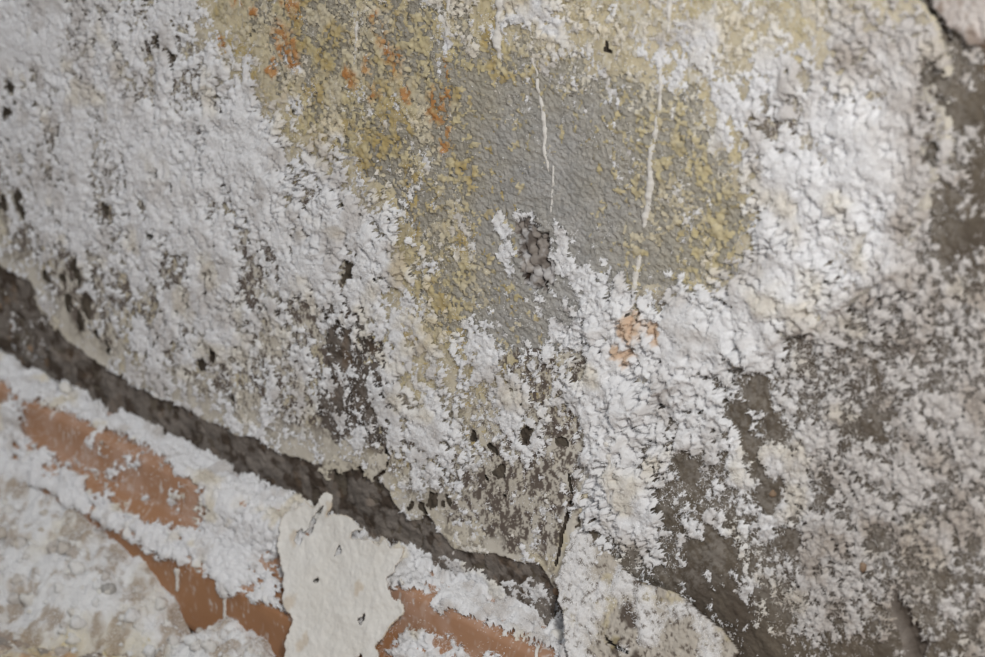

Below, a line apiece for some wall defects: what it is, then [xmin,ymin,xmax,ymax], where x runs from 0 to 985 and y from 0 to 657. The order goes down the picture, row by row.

crack [924,0,953,43]
peeling [27,119,71,191]
peeling [84,86,130,227]
peeling [169,59,204,116]
peeling [745,92,827,167]
peeling [837,0,955,212]
damp [512,204,538,226]
peeling [158,250,188,290]
damp [0,349,314,620]
damp [294,508,339,545]
damp [506,489,562,564]
damp [351,521,568,657]